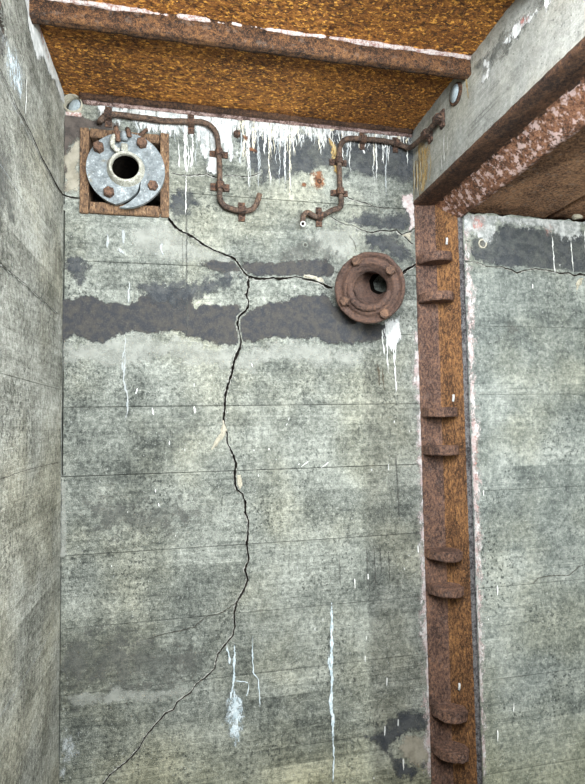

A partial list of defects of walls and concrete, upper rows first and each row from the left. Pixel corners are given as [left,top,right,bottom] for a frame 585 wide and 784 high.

crack [0,263,58,314]
damp [62,100,415,418]
crack [331,217,415,251]
crack [402,264,416,275]
crack [465,261,585,277]
crack [102,218,333,784]
damp [464,214,585,775]
damp [364,331,431,781]
damp [226,639,260,743]